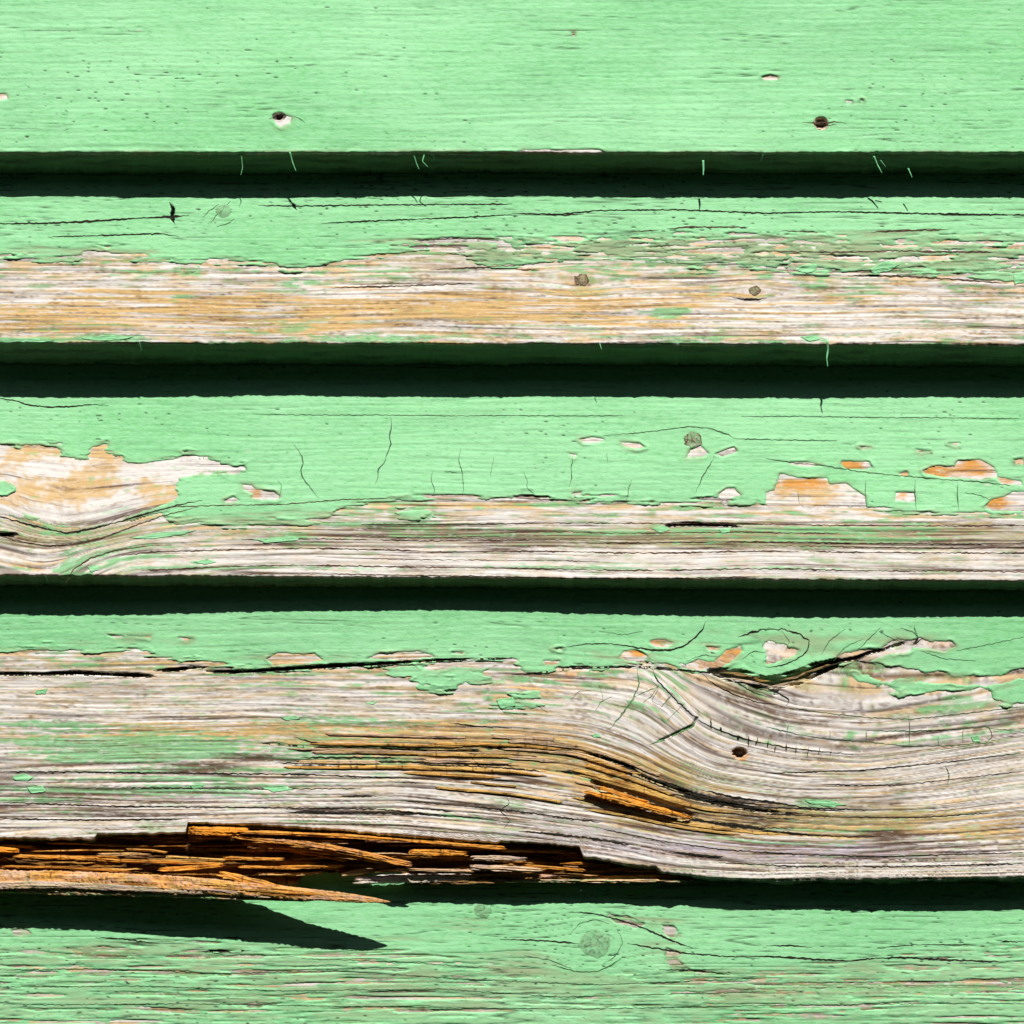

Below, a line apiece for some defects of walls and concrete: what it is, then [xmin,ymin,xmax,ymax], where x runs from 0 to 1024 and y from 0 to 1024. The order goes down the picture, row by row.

crack [0,202,234,237]
peeling [0,232,1024,347]
peeling [0,443,1024,583]
crack [0,621,1022,868]
peeling [0,635,1024,882]